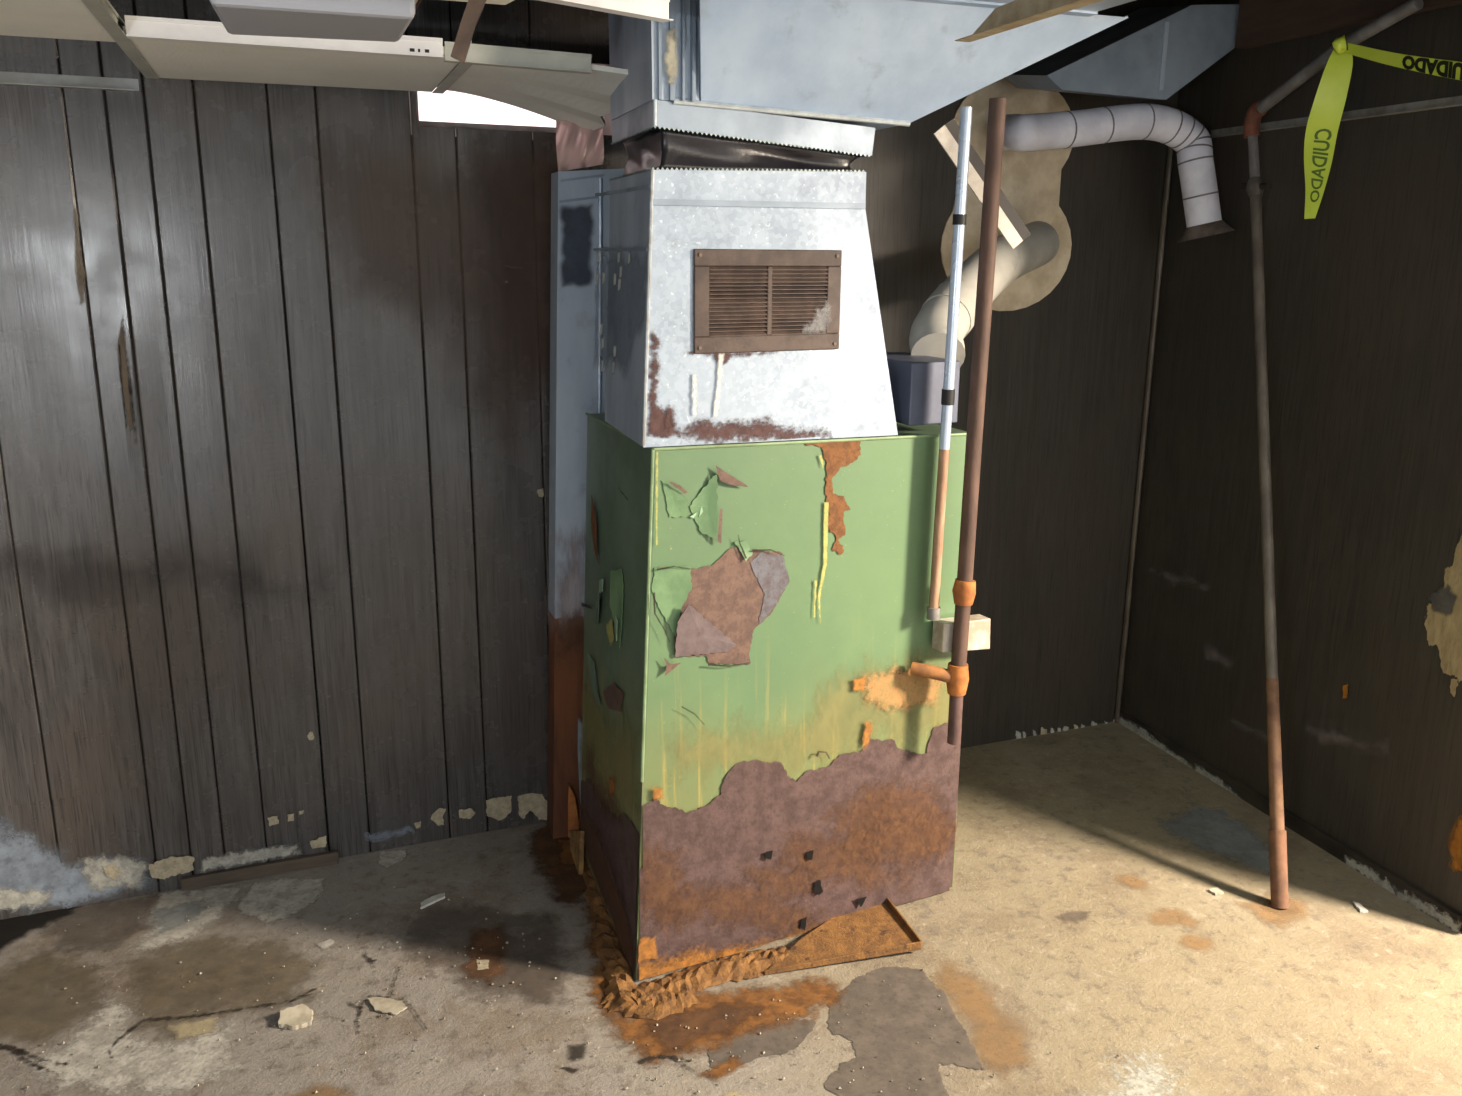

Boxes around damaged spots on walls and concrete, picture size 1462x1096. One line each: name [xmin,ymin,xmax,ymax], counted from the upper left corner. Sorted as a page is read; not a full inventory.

peeling [1424,535,1462,697]
damp [0,821,147,910]
spalling [136,836,327,950]
peeling [268,810,304,826]
peeling [365,793,547,868]
corrosion [530,610,962,1080]
corrosion [1449,815,1462,872]
crack [109,988,315,1058]
crack [349,953,427,1033]
damp [708,966,985,1096]